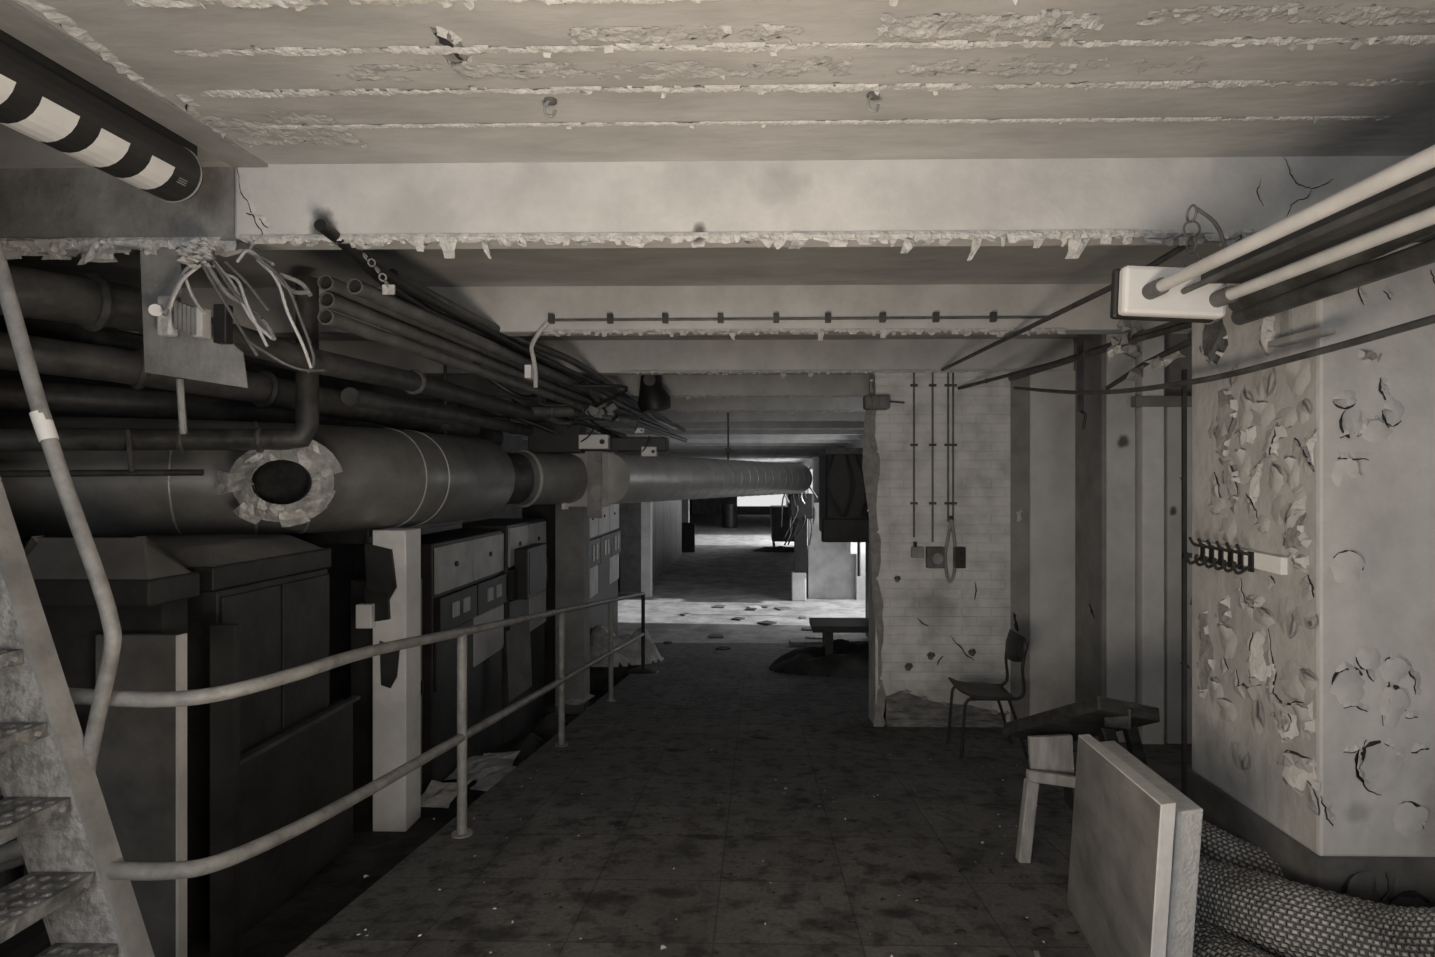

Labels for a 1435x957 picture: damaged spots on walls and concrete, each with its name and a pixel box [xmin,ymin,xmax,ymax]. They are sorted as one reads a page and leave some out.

peeling [123,0,329,11]
peeling [170,0,1435,149]
crack [1256,157,1334,217]
peeling [0,229,1255,265]
peeling [1199,317,1228,367]
peeling [1256,315,1277,356]
peeling [1215,386,1318,515]
spalling [862,379,1010,727]
peeling [1282,508,1312,573]
peeling [1187,592,1267,699]
peeling [1247,627,1321,797]